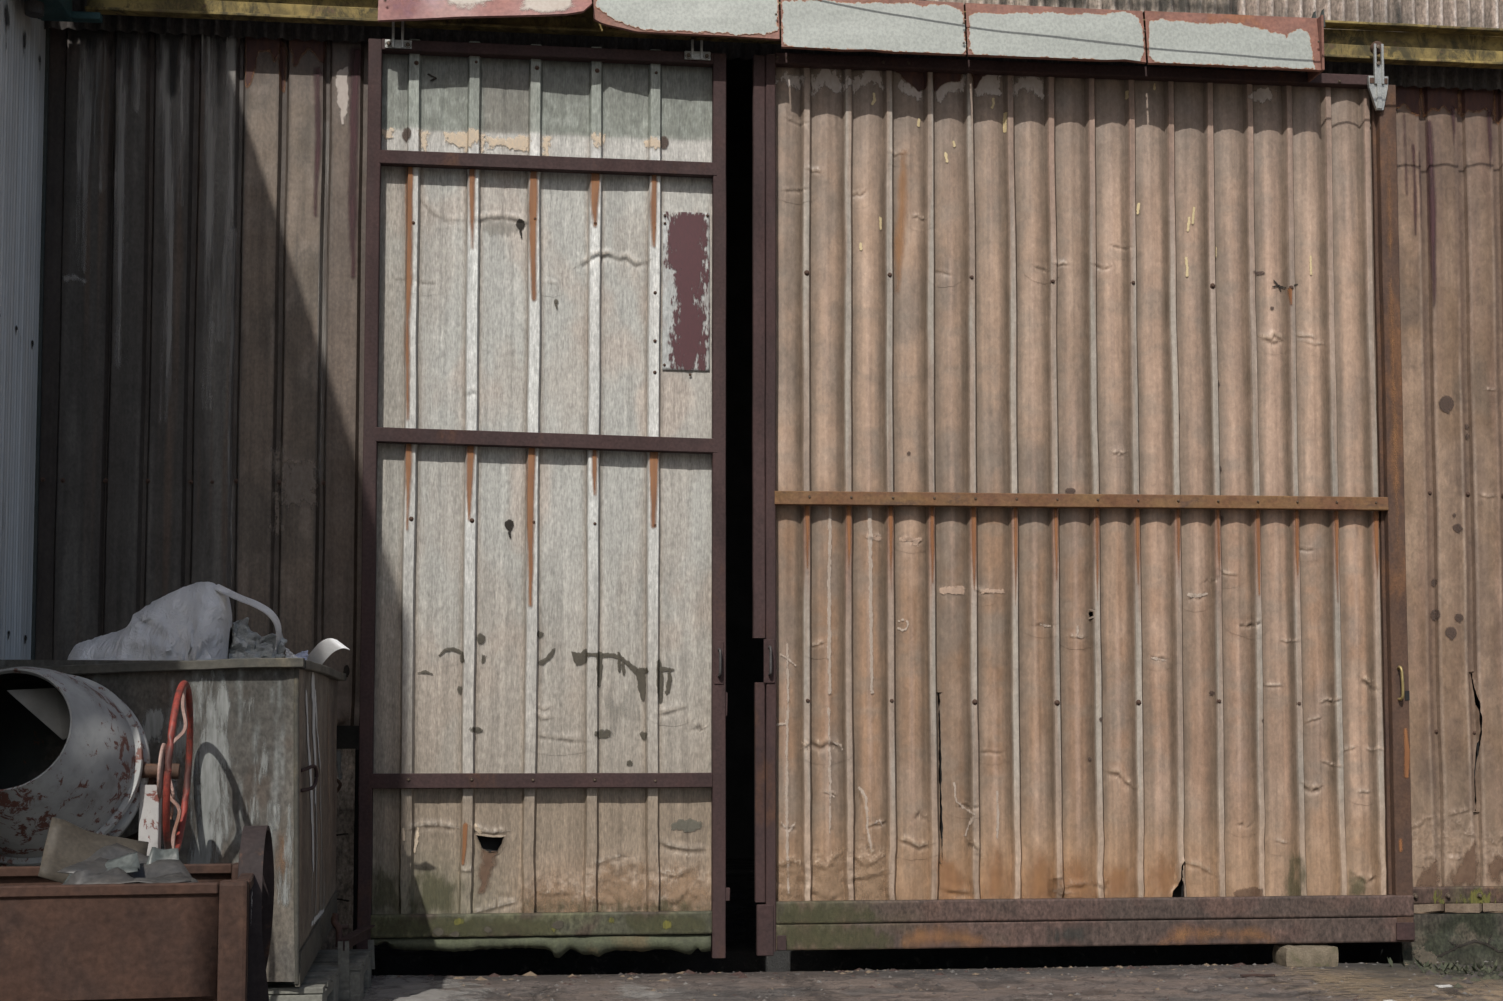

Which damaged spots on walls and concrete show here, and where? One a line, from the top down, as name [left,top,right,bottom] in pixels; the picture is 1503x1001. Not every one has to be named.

water stain [336,67,349,124]
peeling [521,0,572,12]
peeling [595,0,1316,70]
water stain [77,38,140,306]
water stain [160,34,184,377]
water stain [202,34,235,409]
corrosion [405,167,413,419]
corrosion [529,171,538,300]
corrosion [466,446,474,519]
corrosion [527,448,535,606]
corrosion [650,452,658,527]
water stain [472,824,497,892]